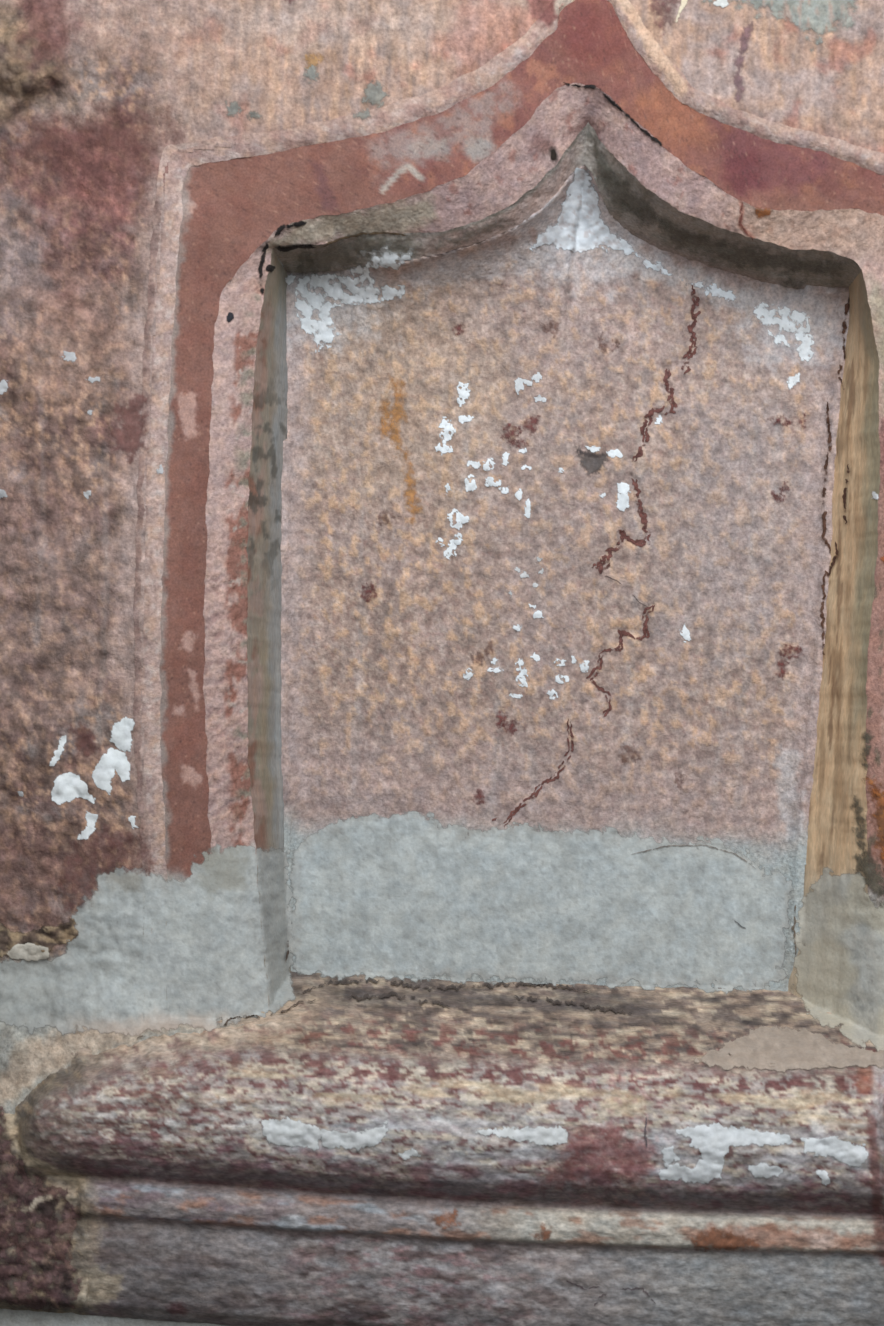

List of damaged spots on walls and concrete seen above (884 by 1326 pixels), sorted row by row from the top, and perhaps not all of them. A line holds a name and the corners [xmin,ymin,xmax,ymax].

crack [586,285,701,717]
peeling [49,716,135,840]
crack [492,719,574,827]
corrosion [866,777,884,861]
spalling [0,918,78,957]
peeling [658,1123,868,1185]